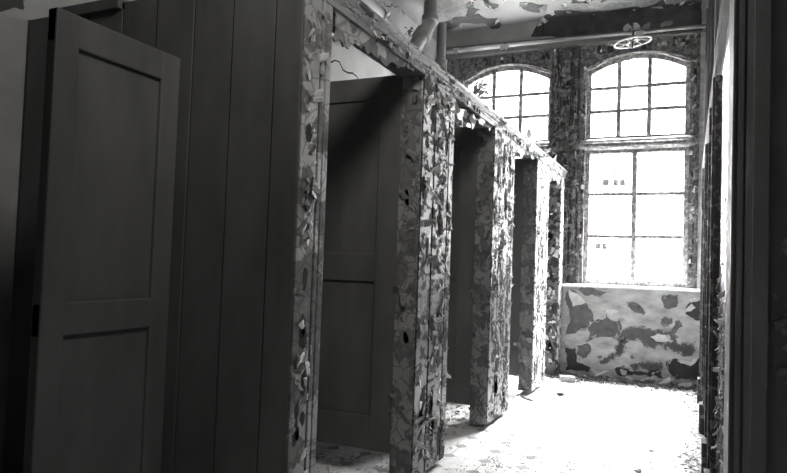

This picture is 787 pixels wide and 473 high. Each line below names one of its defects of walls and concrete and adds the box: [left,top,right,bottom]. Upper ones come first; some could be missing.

peeling [307,10,329,80]
peeling [443,0,508,30]
peeling [519,0,702,55]
peeling [306,123,317,165]
peeling [297,175,321,246]
peeling [370,19,700,465]
peeling [651,186,727,473]
peeling [292,314,310,473]